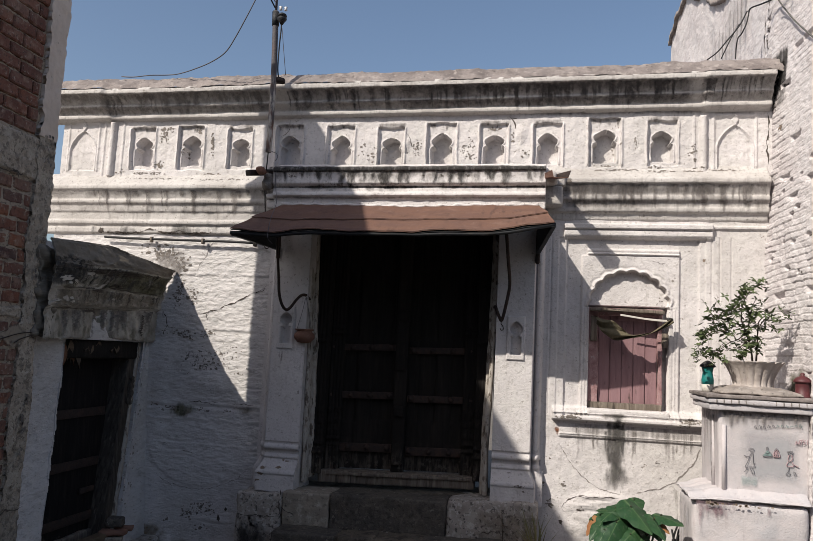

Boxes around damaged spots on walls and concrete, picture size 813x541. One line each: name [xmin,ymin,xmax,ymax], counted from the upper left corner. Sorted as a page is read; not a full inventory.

leakage [287,78,689,115]
leakage [706,70,782,97]
leakage [270,165,546,199]
peeling [141,244,199,309]
crack [53,266,175,337]
crack [194,288,265,320]
peeling [162,329,247,375]
leakage [604,414,625,485]
crack [562,442,712,506]